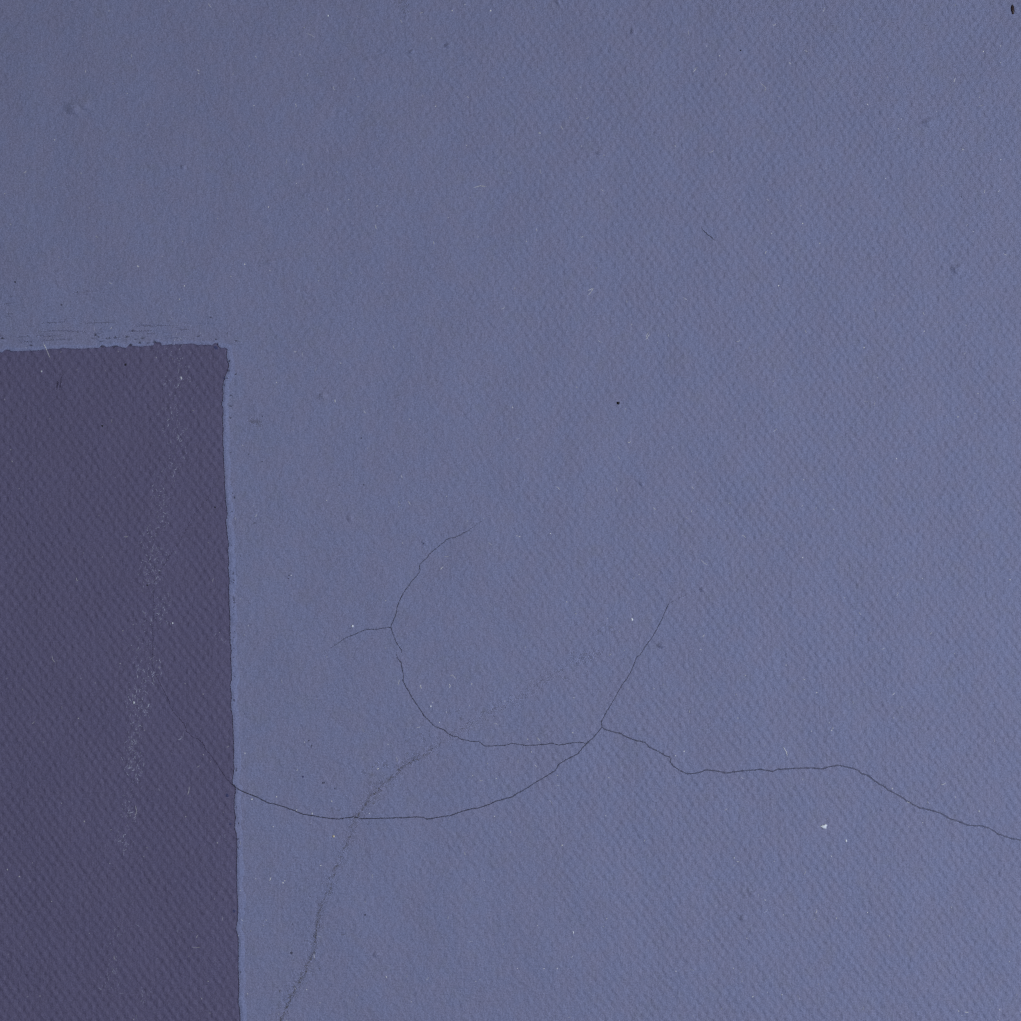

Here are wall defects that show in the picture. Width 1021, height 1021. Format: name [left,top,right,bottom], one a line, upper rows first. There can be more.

crack [363,573,558,746]
crack [232,784,520,819]